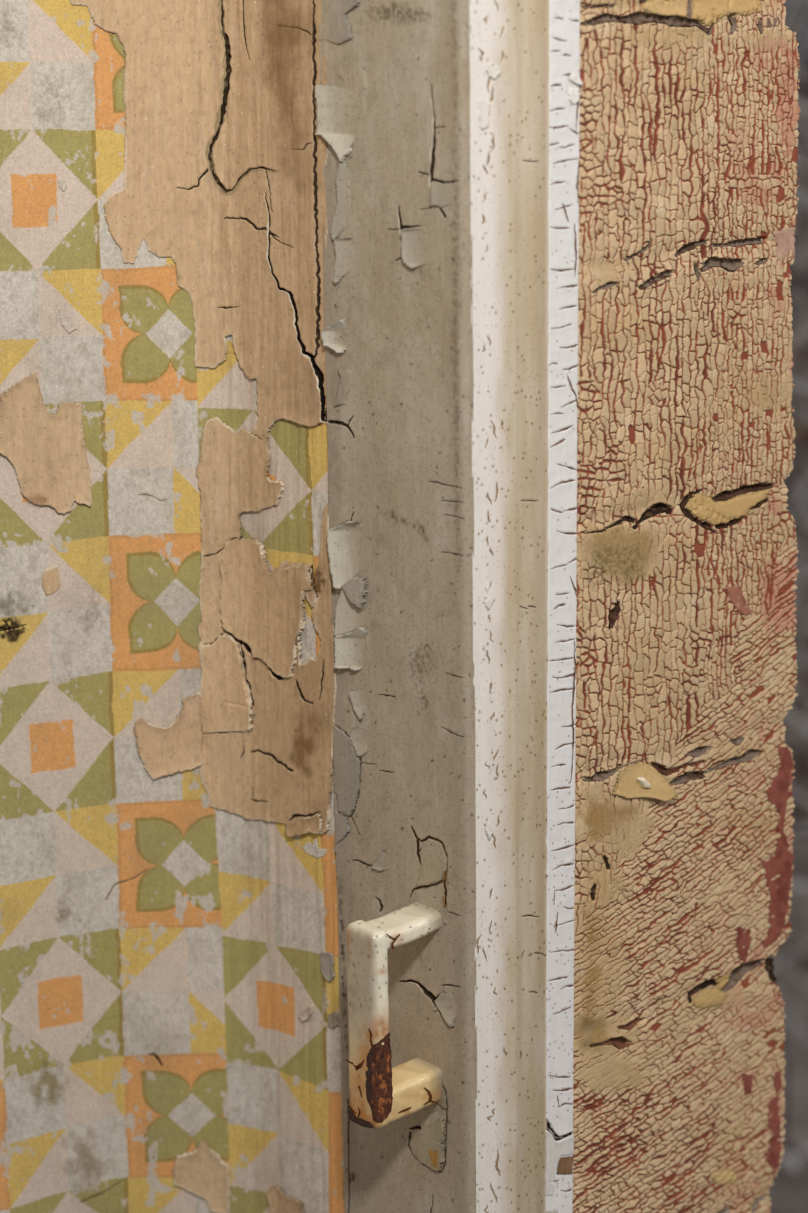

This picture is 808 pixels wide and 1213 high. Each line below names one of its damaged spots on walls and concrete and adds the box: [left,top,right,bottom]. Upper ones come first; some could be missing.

peeling [642,0,780,28]
crack [177,0,355,438]
crack [390,84,456,261]
peeling [0,373,92,515]
peeling [70,0,370,853]
crack [430,1,579,1015]
peeling [685,488,771,526]
crack [205,629,324,772]
peeling [612,761,678,802]
crack [375,826,493,960]
peeling [692,746,795,1008]
crack [400,980,459,1028]